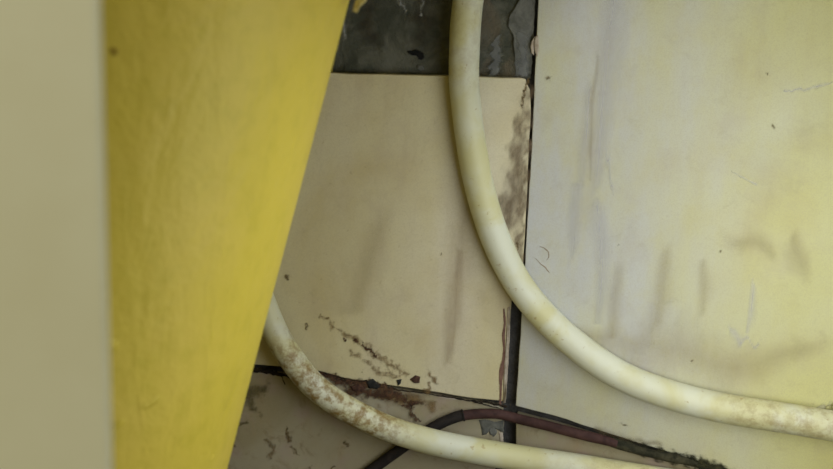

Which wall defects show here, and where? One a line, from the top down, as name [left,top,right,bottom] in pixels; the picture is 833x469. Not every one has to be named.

corrosion [320,333,436,422]